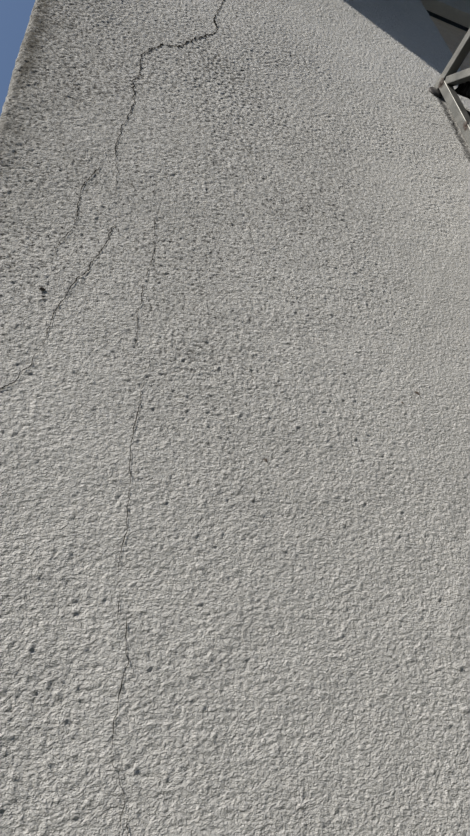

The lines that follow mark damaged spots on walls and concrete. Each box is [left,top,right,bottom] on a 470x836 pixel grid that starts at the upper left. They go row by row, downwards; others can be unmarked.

crack [55,0,225,255]
crack [0,225,115,389]
crack [111,217,156,836]